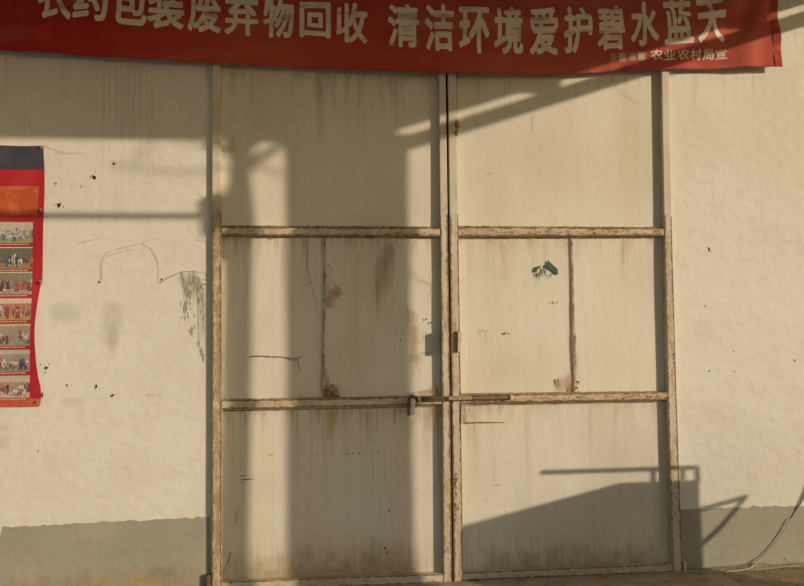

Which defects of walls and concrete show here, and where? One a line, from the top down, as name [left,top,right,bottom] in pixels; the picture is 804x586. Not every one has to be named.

corrosion [212,203,682,586]